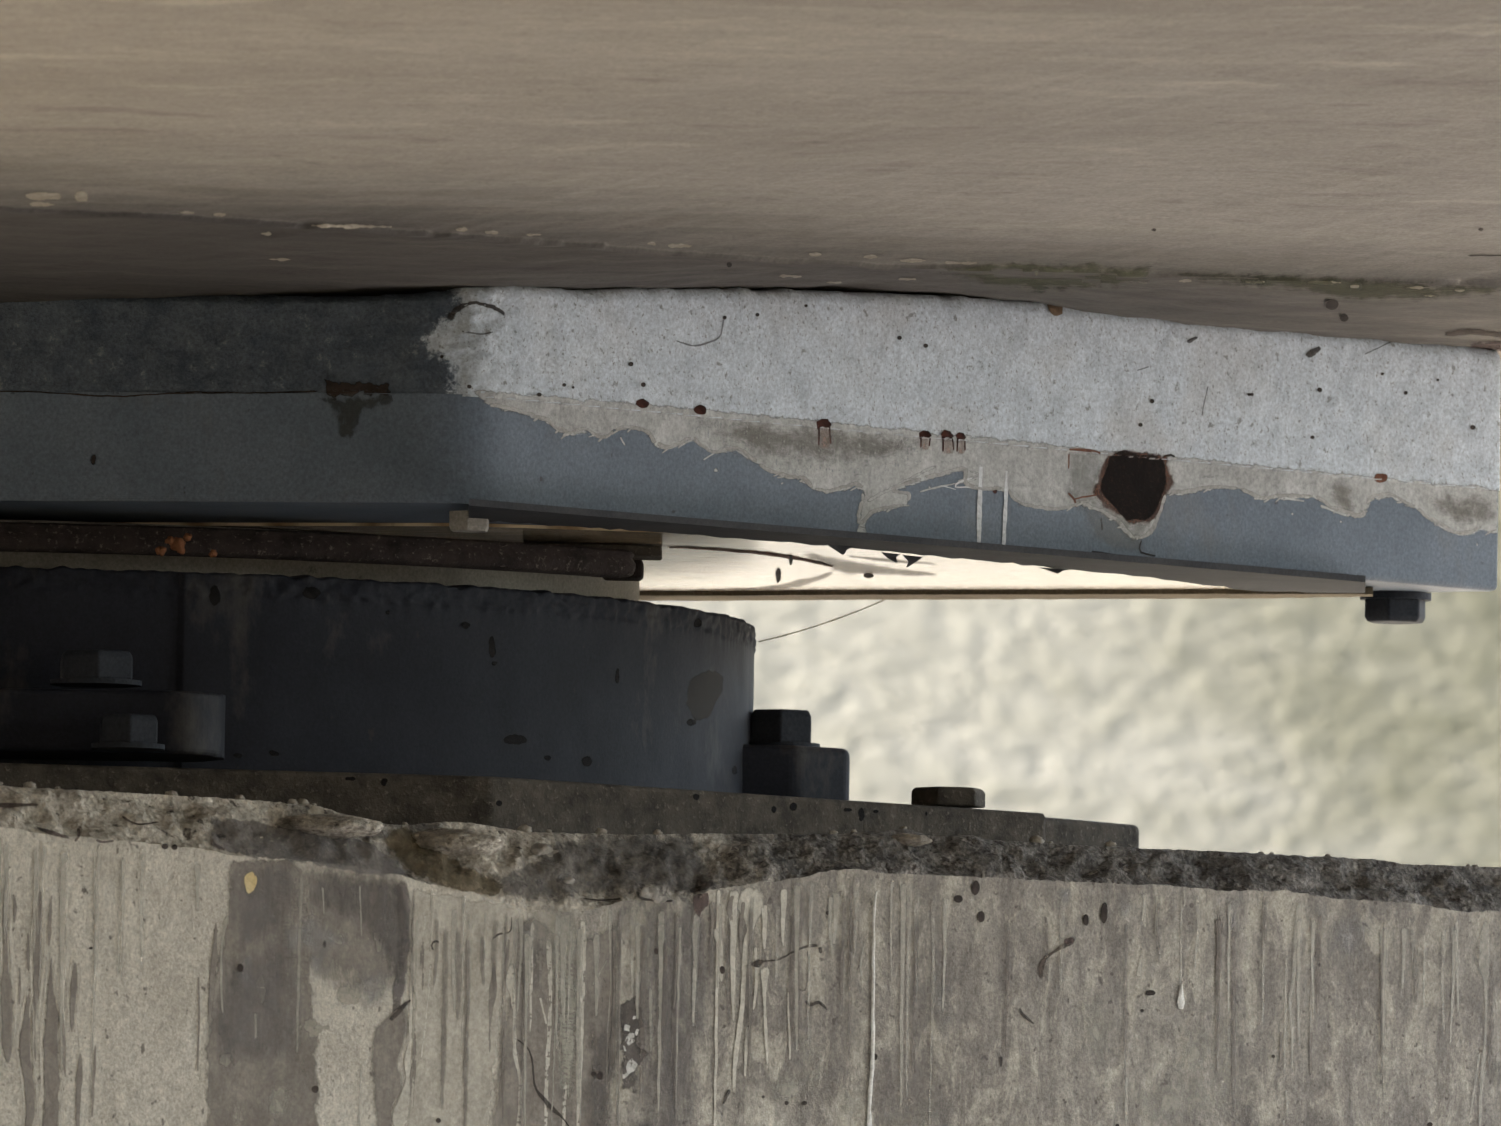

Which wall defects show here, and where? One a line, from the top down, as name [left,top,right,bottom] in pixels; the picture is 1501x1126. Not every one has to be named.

corrosion [816,419,832,445]
corrosion [919,430,966,452]
corrosion [155,533,192,556]
peeling [307,805,324,815]
spalling [492,834,732,917]
leakage [828,893,839,959]
spalling [1083,903,1108,926]
leakage [197,827,502,1126]
leakage [1380,929,1426,1047]
leakage [1450,922,1459,1044]